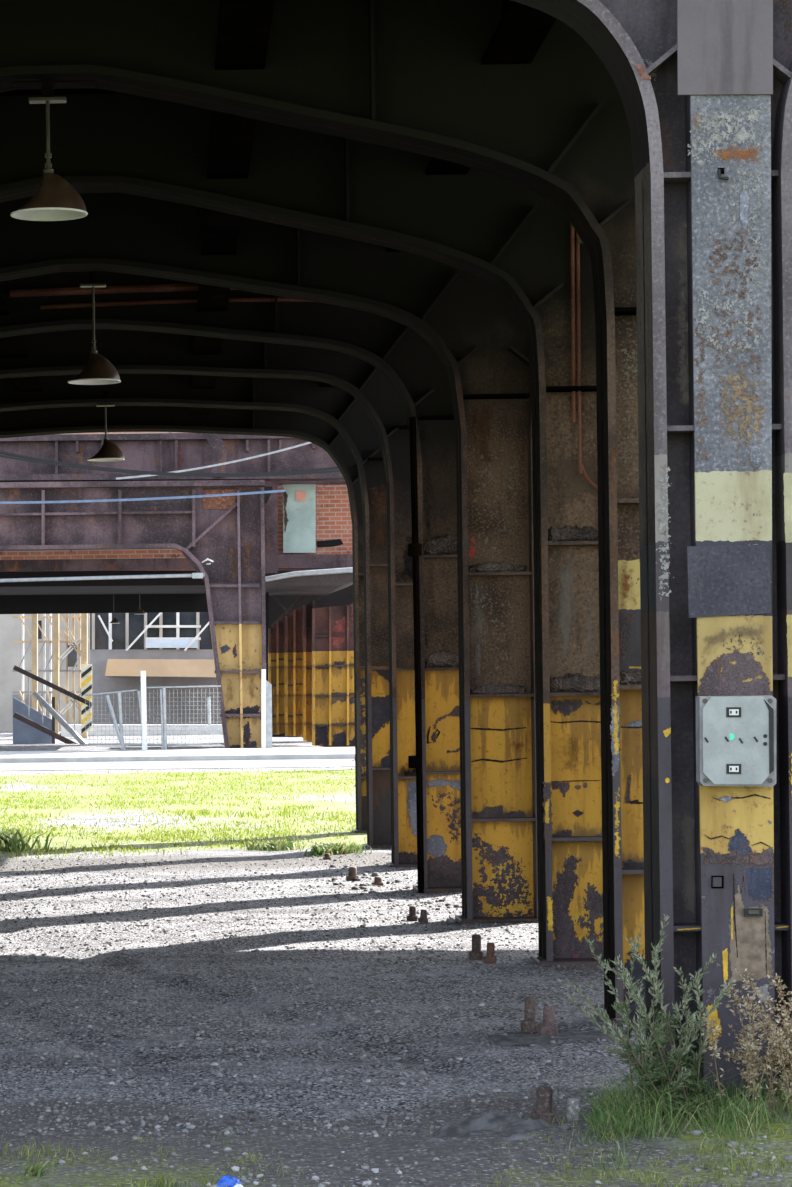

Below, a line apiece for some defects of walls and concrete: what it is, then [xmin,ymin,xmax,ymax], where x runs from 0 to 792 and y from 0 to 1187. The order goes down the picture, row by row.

peeling [688,100,764,166]
rust [717,147,758,161]
peeling [692,165,765,461]
rust [706,228,766,447]
peeling [656,466,674,600]
peeling [315,726,355,747]
peeling [331,692,354,704]
peeling [365,670,390,742]
peeling [542,673,644,868]
peeling [698,649,771,696]
peeling [391,768,604,958]
peeling [702,828,774,1004]